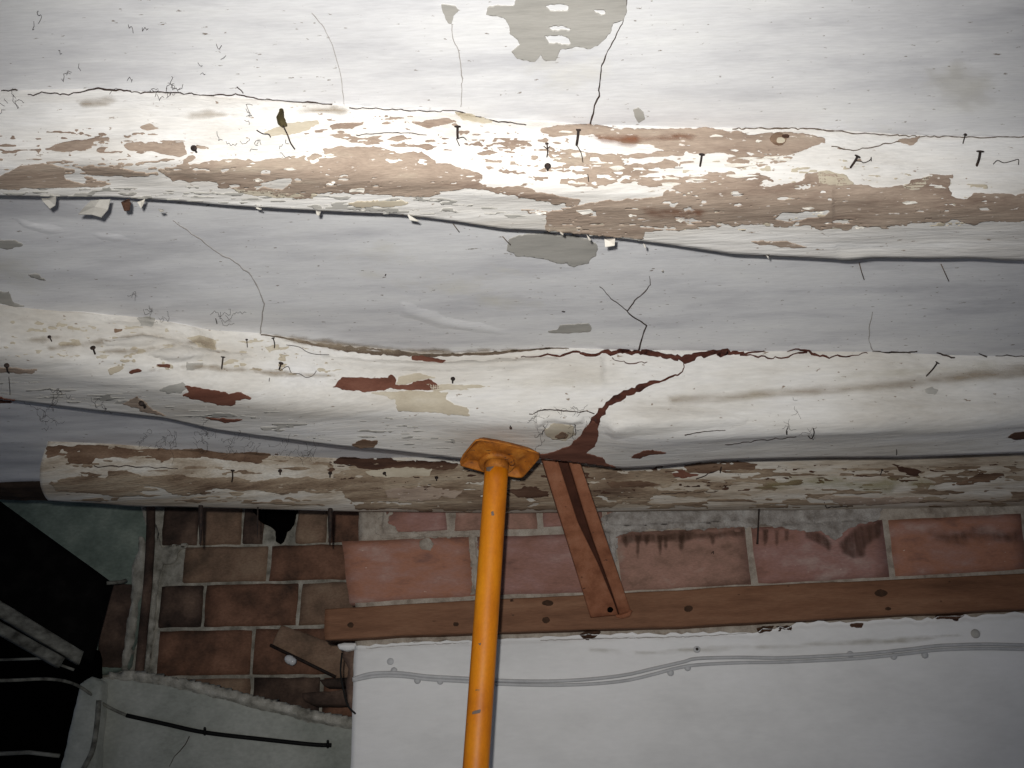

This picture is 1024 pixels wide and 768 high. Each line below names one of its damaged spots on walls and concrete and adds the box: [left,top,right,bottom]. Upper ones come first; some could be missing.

crack [1,13,526,136]
peeling [486,0,627,62]
crack [590,20,624,124]
peeling [0,107,1024,267]
peeling [0,291,331,441]
crack [173,220,1024,436]
crack [94,463,178,471]
peeling [45,355,490,501]
flaking render [539,421,757,488]
crack [685,430,795,445]
hole [252,509,298,544]
leakage [601,508,882,563]